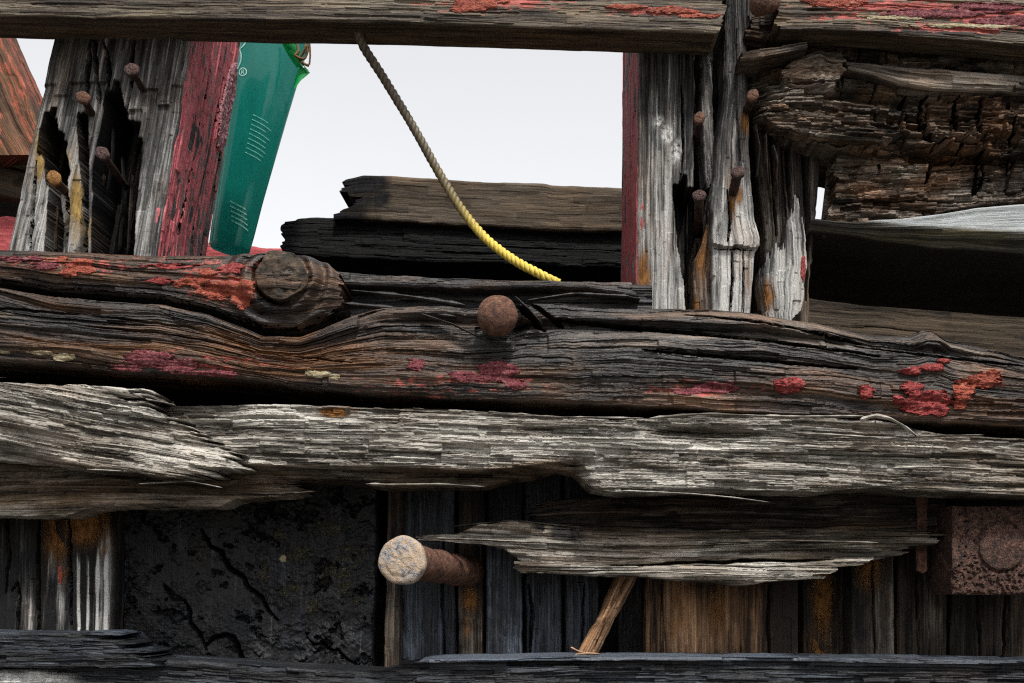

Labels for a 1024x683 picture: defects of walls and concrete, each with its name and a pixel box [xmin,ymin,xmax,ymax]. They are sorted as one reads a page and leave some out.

peeling [449,0,510,13]
peeling [604,3,721,19]
peeling [800,0,1024,29]
peeling [216,62,238,153]
corrosion [729,189,741,218]
peeling [0,255,97,278]
peeling [138,262,256,311]
peeling [448,360,527,391]
peeling [773,377,806,394]
peeling [893,358,1004,418]
crack [201,530,273,613]
crack [184,600,245,658]